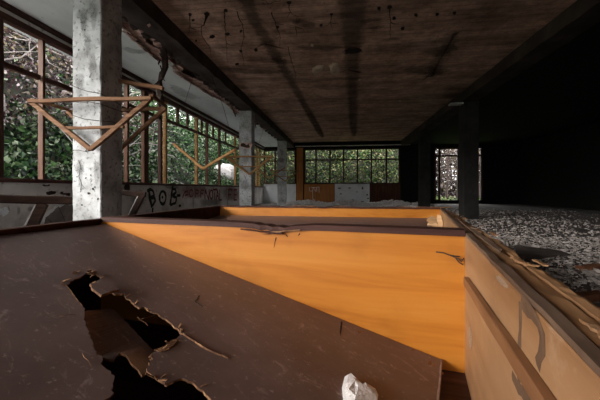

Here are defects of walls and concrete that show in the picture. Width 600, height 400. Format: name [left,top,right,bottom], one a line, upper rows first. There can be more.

flaking render [122,16,241,115]